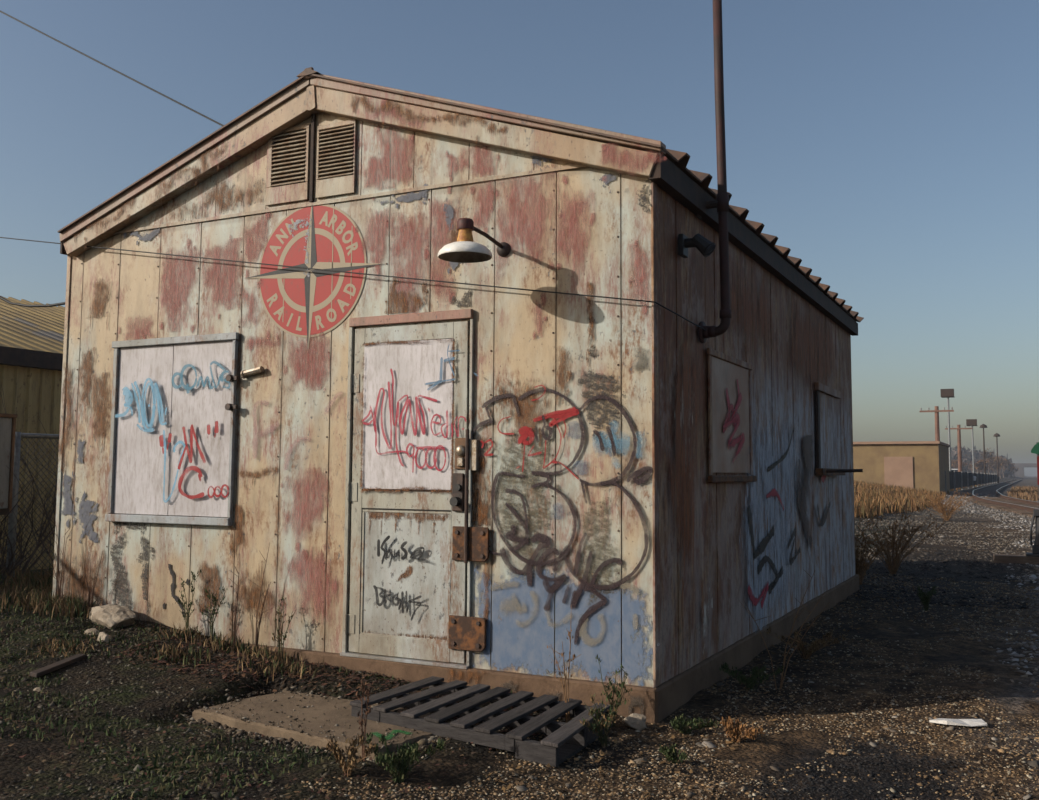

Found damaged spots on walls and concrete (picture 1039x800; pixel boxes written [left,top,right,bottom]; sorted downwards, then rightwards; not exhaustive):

corrosion [86,281,110,326]
corrosion [59,348,111,486]
peeling [56,434,98,543]